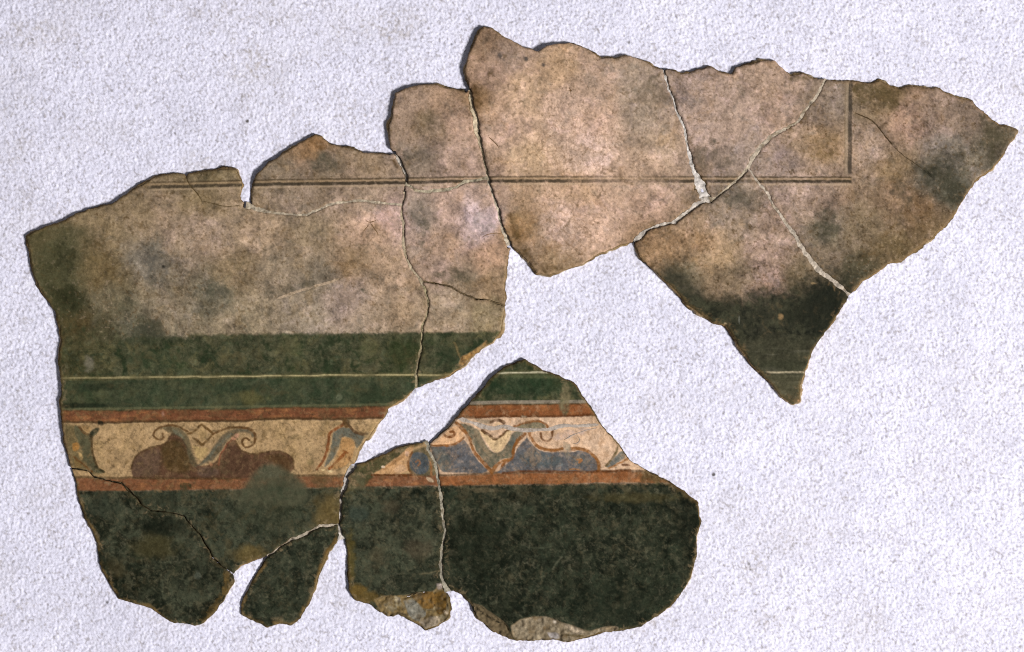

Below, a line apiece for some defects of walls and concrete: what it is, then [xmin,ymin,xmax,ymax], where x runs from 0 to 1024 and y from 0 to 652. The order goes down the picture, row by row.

crack [186,90,511,388]
crack [633,70,851,296]
crack [72,468,233,574]
crack [267,464,356,557]
crack [386,440,501,623]